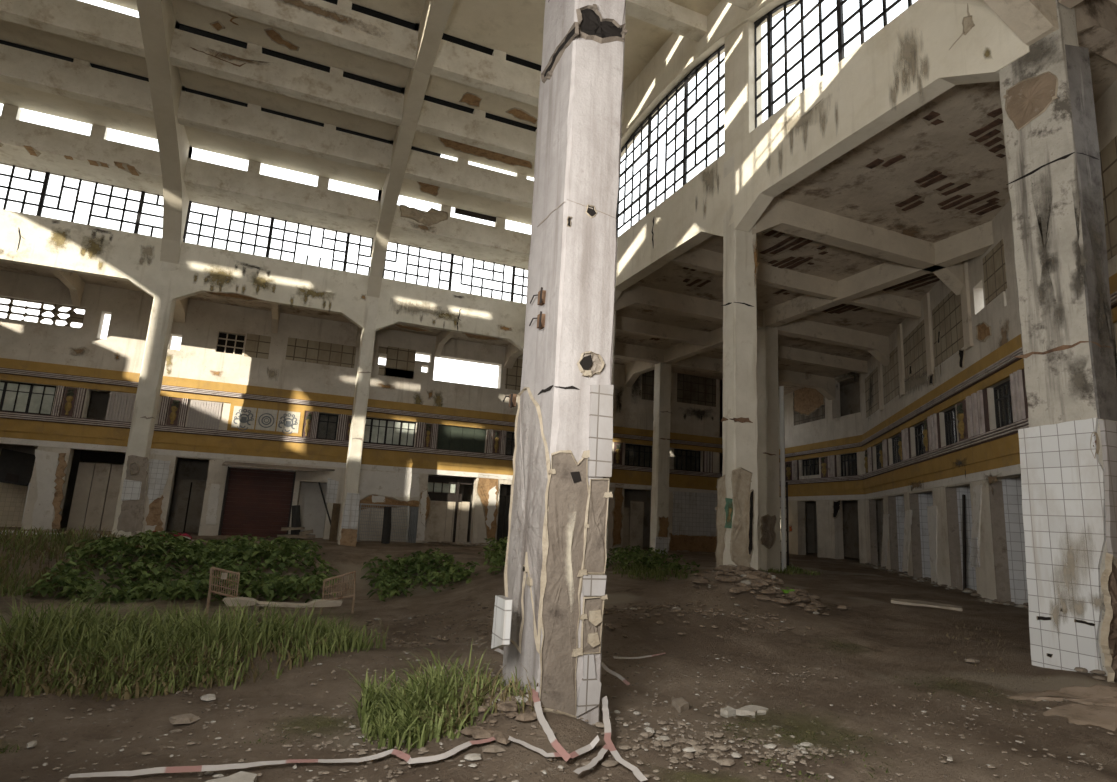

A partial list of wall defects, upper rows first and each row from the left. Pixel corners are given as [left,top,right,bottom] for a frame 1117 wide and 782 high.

peeling [212,50,264,63]
spalling [264,28,300,51]
spalling [541,4,627,83]
spalling [967,107,1006,160]
damp [1037,207,1057,303]
damp [1071,202,1115,347]
spalling [476,387,613,718]
spalling [715,467,777,567]
spalling [1007,553,1117,731]